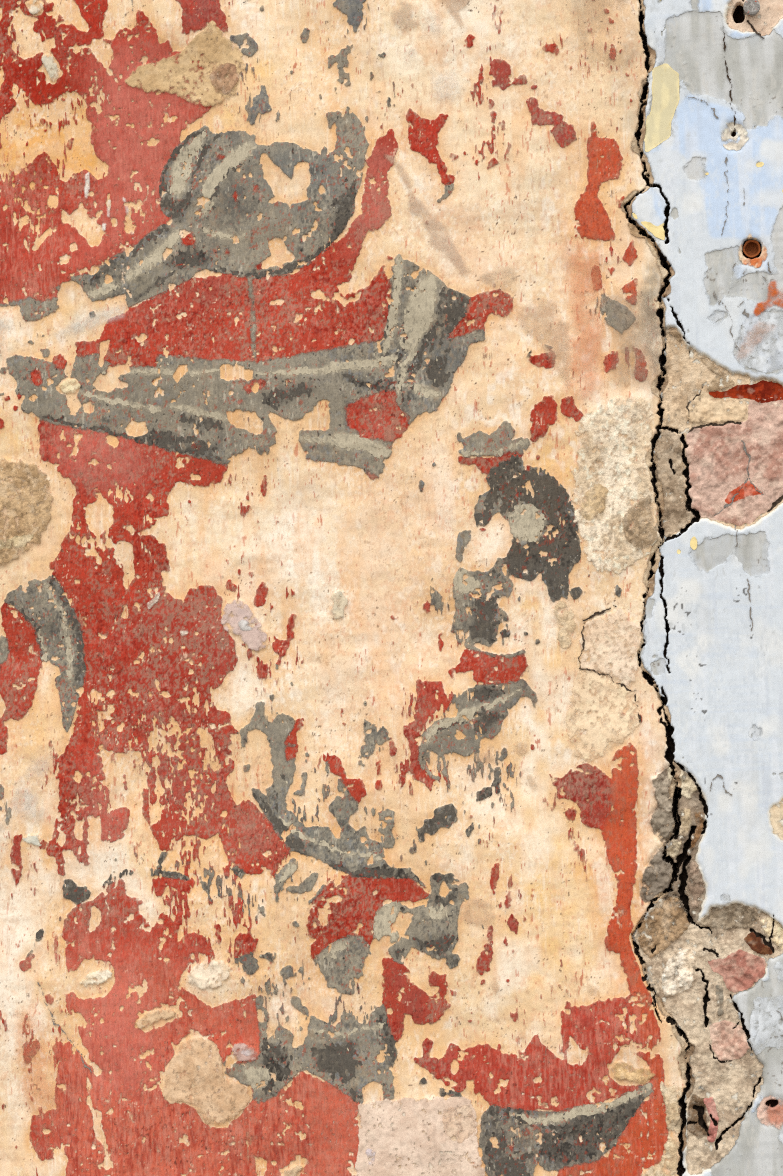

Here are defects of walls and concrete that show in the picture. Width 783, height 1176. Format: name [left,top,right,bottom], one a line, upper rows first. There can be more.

peeling [176,0,233,34]
peeling [0,0,215,304]
peeling [52,46,638,393]
peeling [237,379,266,404]
peeling [344,389,411,443]
peeling [414,0,783,1176]
crack [578,0,783,1176]
peeling [0,419,360,1176]
peeling [317,634,528,804]
peeling [295,874,429,960]
peeling [382,958,456,1042]
rust [768,1106,783,1123]